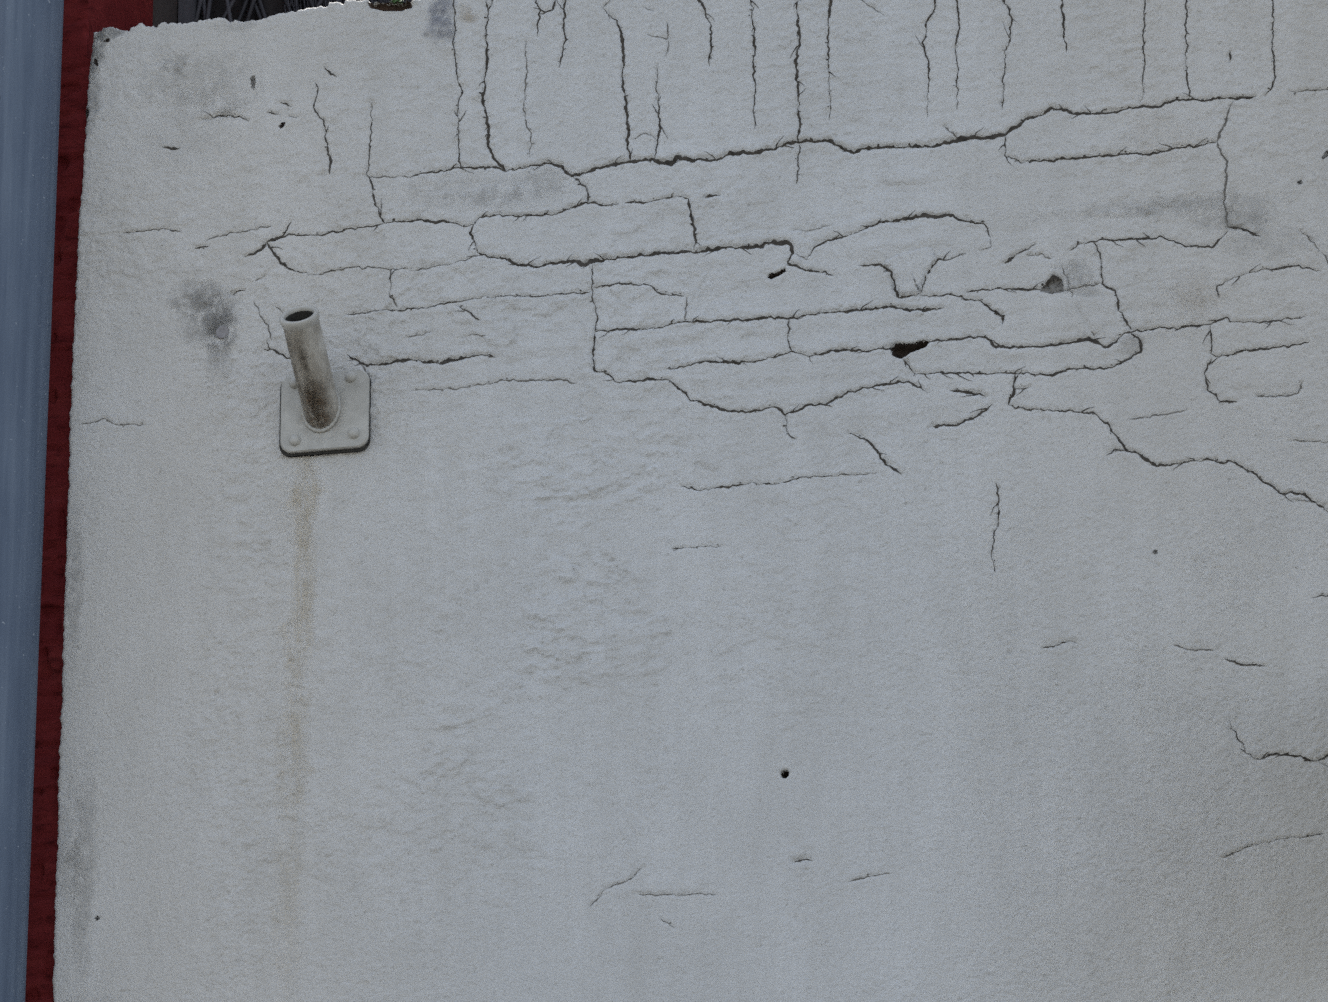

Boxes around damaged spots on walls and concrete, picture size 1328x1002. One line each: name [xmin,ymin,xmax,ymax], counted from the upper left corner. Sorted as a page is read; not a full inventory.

crack [125,0,1328,512]
crack [990,484,1000,571]
crack [1230,724,1328,766]
crack [591,868,715,926]